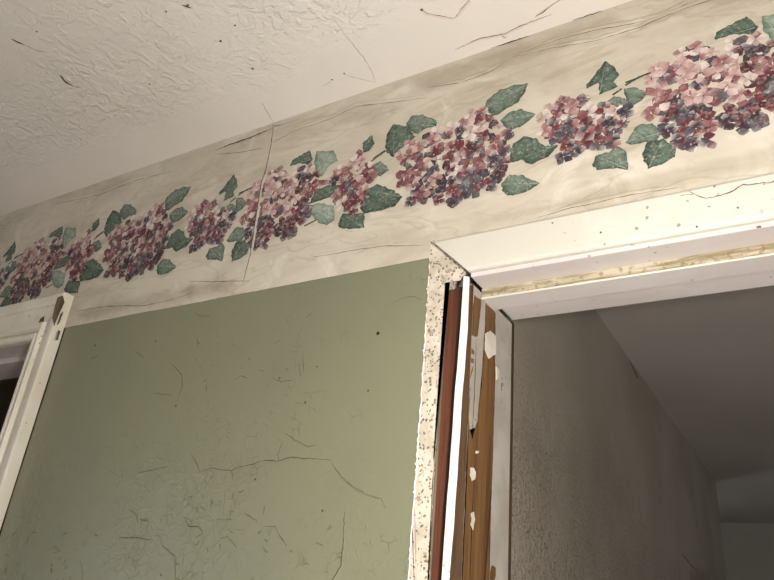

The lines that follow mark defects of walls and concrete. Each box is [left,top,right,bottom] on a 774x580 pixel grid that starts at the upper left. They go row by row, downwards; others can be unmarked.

crack [458,0,560,49]
crack [681,181,774,199]
crack [191,434,385,507]
flaking render [407,238,467,580]
peeling [461,295,499,580]
crack [119,510,180,580]
crack [184,513,287,547]
crack [332,512,345,580]